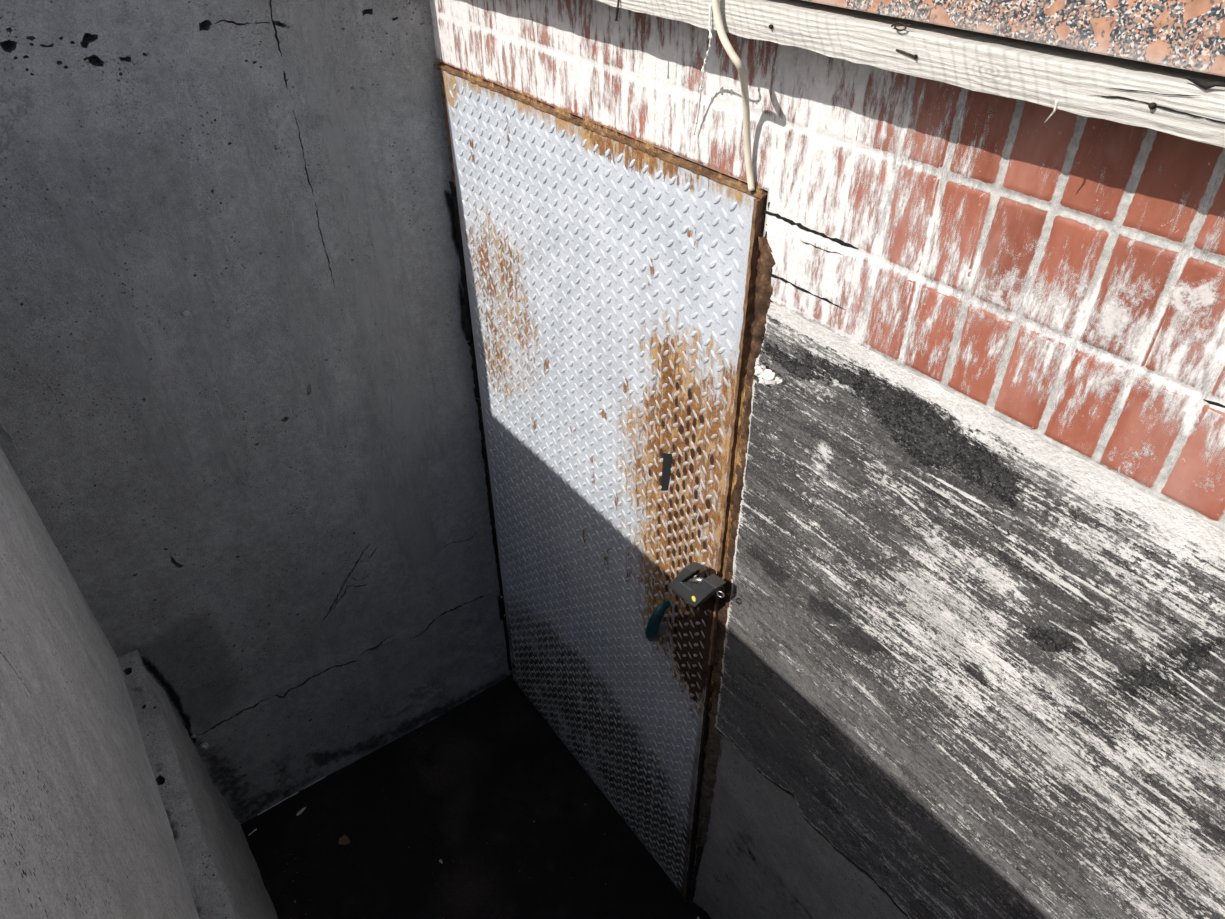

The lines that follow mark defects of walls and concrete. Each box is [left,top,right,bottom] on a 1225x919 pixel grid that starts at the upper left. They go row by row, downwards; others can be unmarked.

crack [214,0,334,283]
corrosion [441,70,761,203]
corrosion [469,205,549,394]
crack [771,274,845,310]
crack [763,210,858,255]
crack [1203,399,1225,408]
corrosion [599,325,750,716]
crack [196,593,491,735]